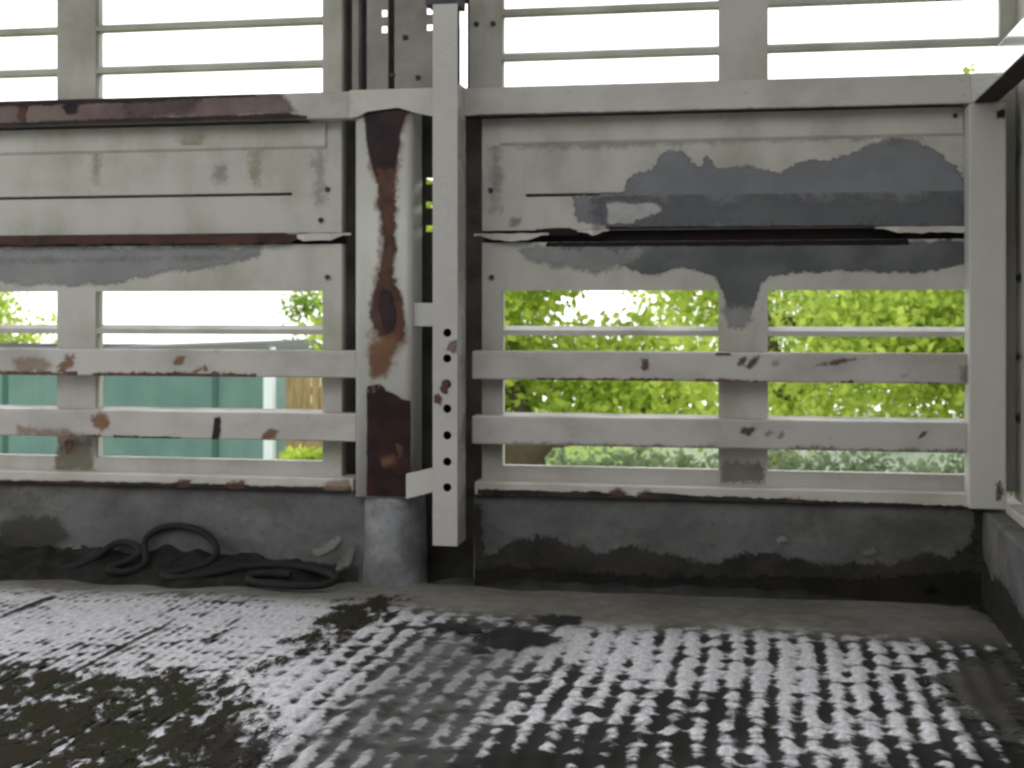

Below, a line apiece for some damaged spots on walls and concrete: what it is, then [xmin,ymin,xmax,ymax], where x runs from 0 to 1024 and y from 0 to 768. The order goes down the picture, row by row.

rust [0,93,311,131]
peeling [536,137,964,247]
rust [364,108,411,497]
rust [0,354,77,375]
rust [92,356,256,377]
rust [536,359,674,381]
rust [695,353,767,382]
rust [434,380,449,405]
rust [17,413,180,439]
rust [212,417,221,439]
water stain [475,503,1024,753]